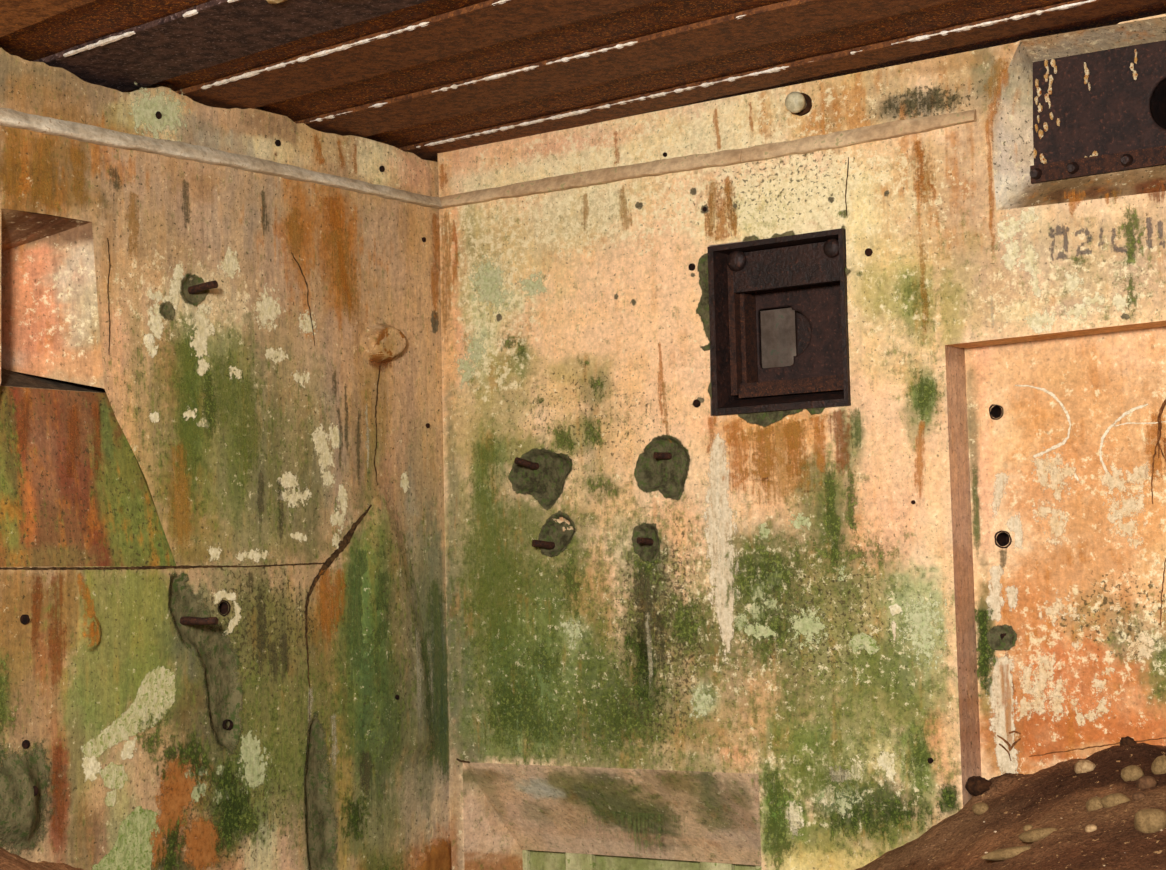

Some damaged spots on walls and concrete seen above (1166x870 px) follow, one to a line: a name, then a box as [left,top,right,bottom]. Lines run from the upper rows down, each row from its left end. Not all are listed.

rust [705,177,736,240]
crack [0,365,381,732]
leakage [258,471,284,543]
leakage [332,372,361,478]
spalling [508,448,576,557]
spalling [630,523,662,582]
spalling [634,435,690,500]
efflorescence [703,433,744,660]
rust [708,410,850,489]
leakage [824,470,858,574]
leakage [850,409,861,446]
crack [1151,399,1166,504]